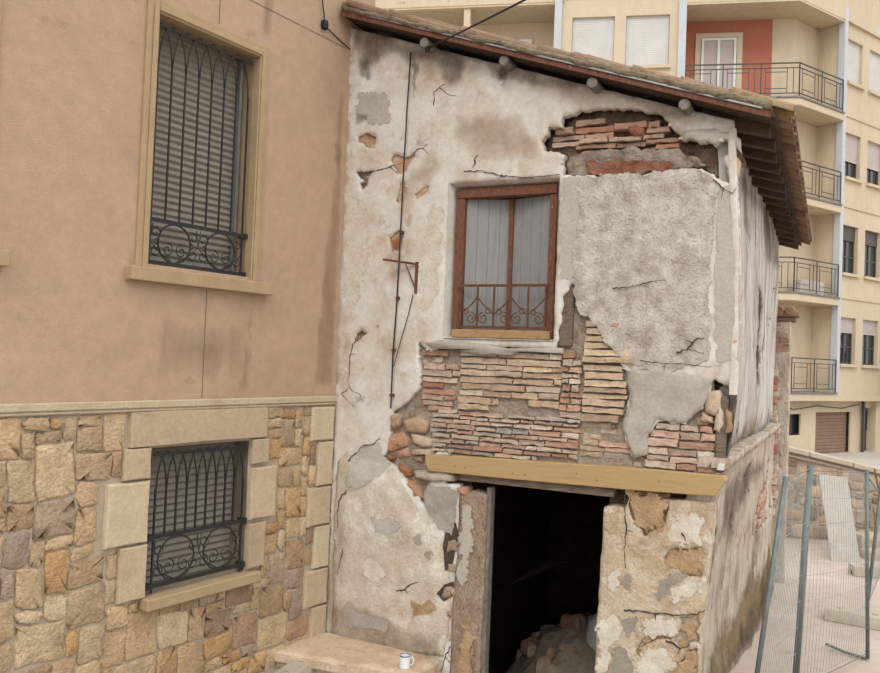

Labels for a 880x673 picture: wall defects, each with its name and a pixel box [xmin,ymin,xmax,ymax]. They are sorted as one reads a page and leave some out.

spalling [358,170,373,189]
spalling [359,134,376,148]
crack [371,144,429,173]
spalling [386,110,747,503]
crack [341,340,363,401]
spalling [625,490,672,535]
spalling [443,523,458,571]
spalling [436,581,454,601]
leakage [710,544,771,673]